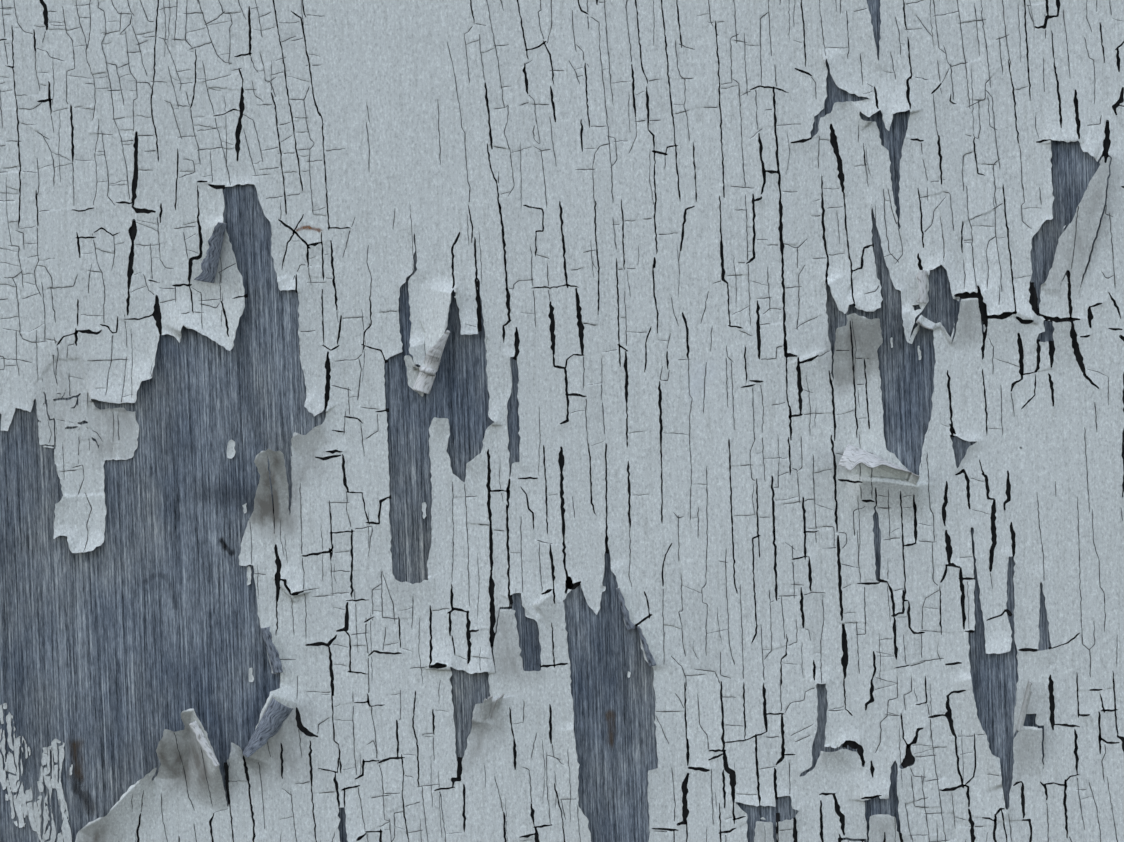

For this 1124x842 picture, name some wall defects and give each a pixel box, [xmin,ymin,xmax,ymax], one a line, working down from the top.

crack [131,790,144,842]
peeling [0,126,329,842]
crack [161,407,581,842]
peeling [342,233,523,619]
peeling [562,520,689,842]
peeling [776,0,966,592]
peeling [950,436,977,468]
peeling [990,37,1116,373]